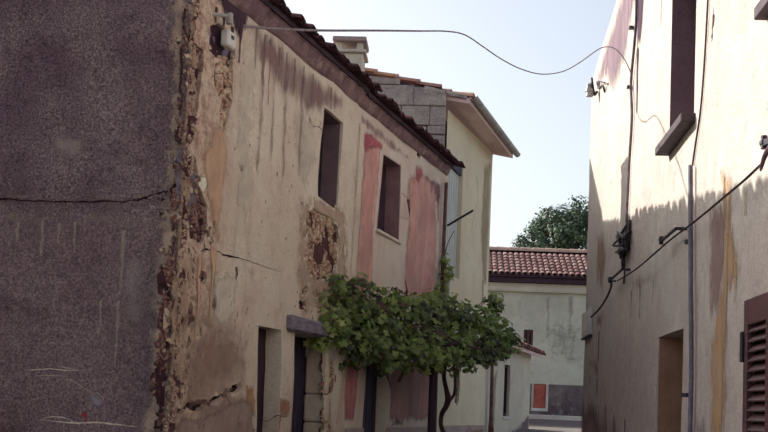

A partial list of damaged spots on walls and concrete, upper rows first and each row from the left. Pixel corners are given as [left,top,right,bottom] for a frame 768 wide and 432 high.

leakage [215,0,248,62]
leakage [255,29,338,161]
leakage [601,0,643,113]
crack [0,190,173,203]
spalling [143,0,255,432]
crack [202,248,280,279]
spalling [294,202,347,317]
peeling [355,133,382,303]
rust [709,171,737,432]